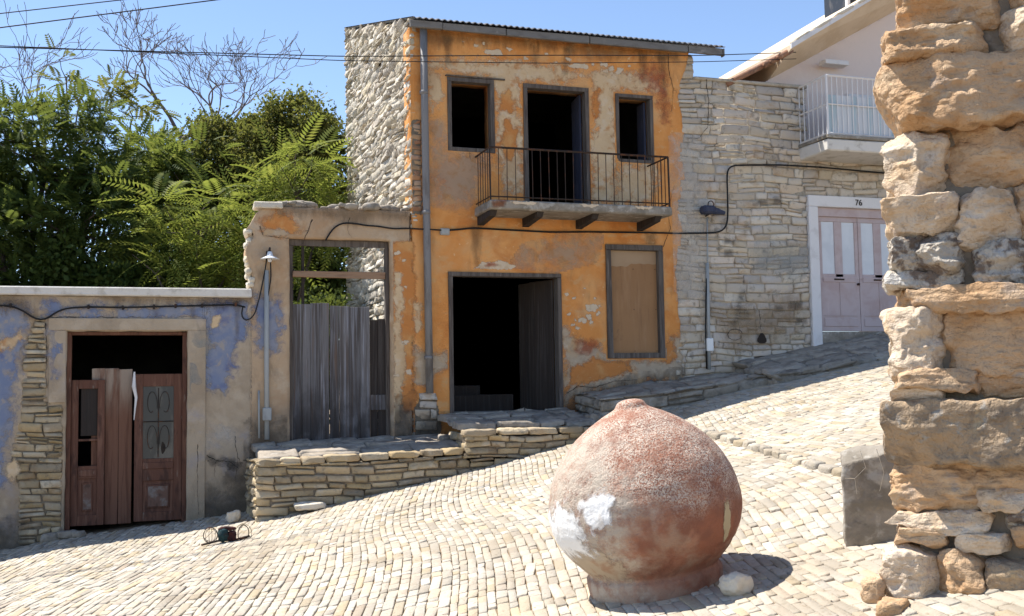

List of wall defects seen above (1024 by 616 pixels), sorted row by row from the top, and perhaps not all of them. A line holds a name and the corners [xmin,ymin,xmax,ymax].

flaking render [428,41,666,210]
flaking render [243,212,299,289]
flaking render [0,332,23,351]
flaking render [393,251,448,422]
flaking render [562,288,685,407]
flaking render [6,460,21,481]